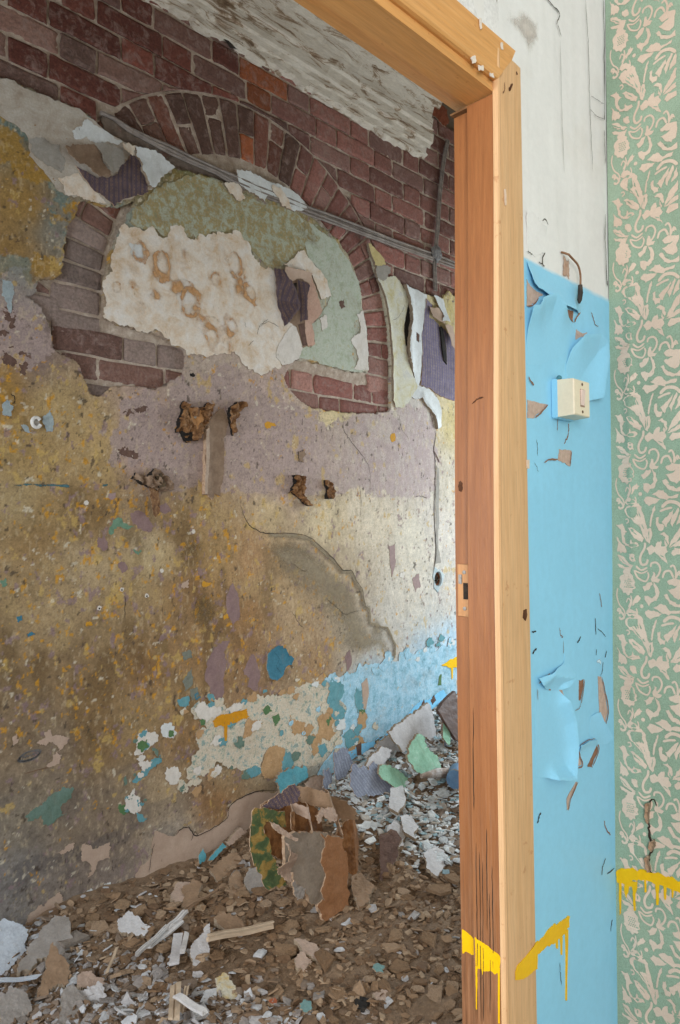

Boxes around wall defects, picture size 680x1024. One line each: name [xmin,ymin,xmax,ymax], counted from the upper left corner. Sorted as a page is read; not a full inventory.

flaking render [0,0,455,434]
peeling [526,209,610,401]
peeling [527,400,548,419]
crack [240,501,370,615]
peeling [118,634,457,878]
peeling [535,653,614,810]